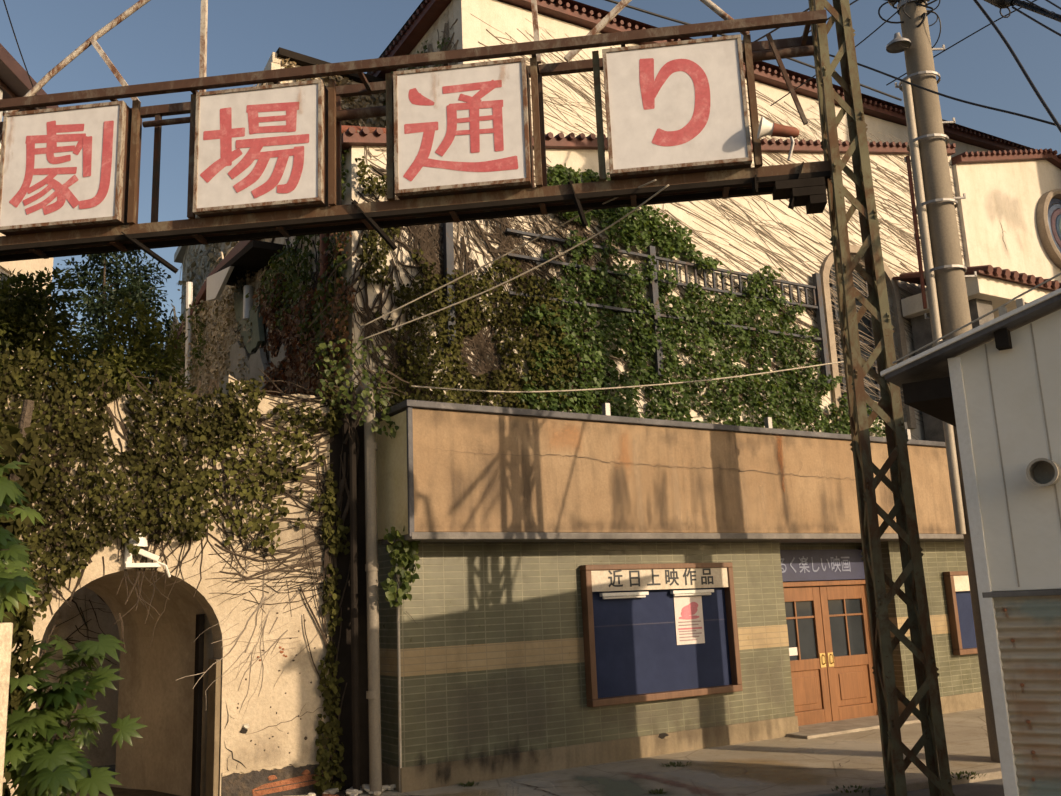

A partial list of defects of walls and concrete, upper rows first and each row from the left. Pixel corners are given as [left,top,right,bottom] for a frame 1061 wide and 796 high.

flaking render [221,723,330,796]